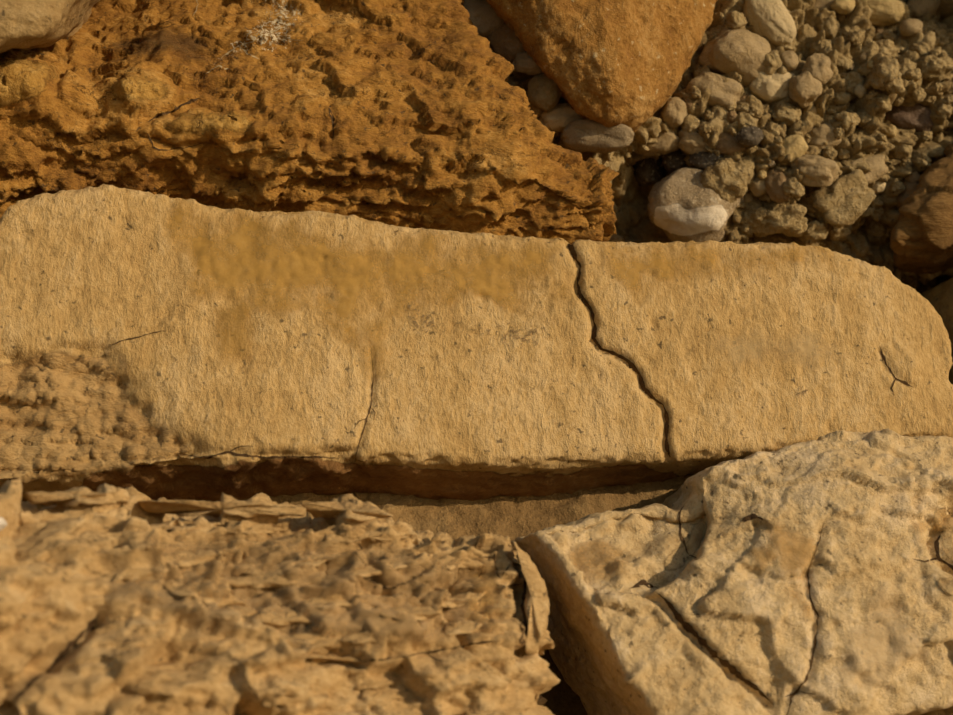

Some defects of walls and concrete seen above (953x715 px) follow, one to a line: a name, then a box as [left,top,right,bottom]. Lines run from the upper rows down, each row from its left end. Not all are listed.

crack [184,352,376,461]
crack [558,238,670,457]
crack [879,346,912,394]
crack [914,527,953,570]
crack [629,523,824,715]